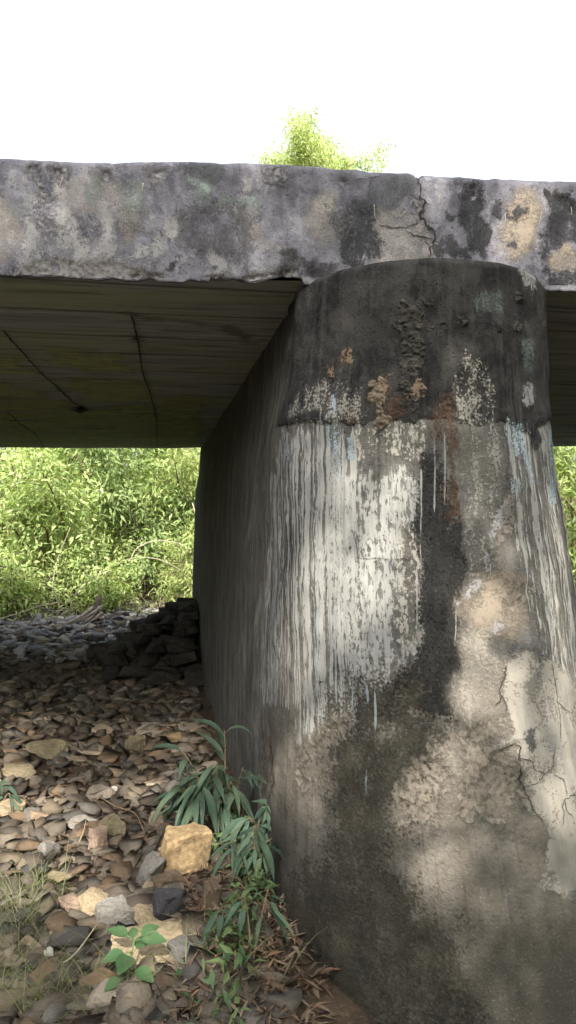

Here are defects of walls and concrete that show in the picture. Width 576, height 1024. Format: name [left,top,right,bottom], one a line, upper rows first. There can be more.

leakage [274,173,420,277]
crack [380,174,443,256]
leakage [432,179,528,259]
crack [3,330,81,411]
crack [131,315,158,450]
rust [429,393,461,522]
leakage [275,348,557,1024]
crack [496,659,575,824]